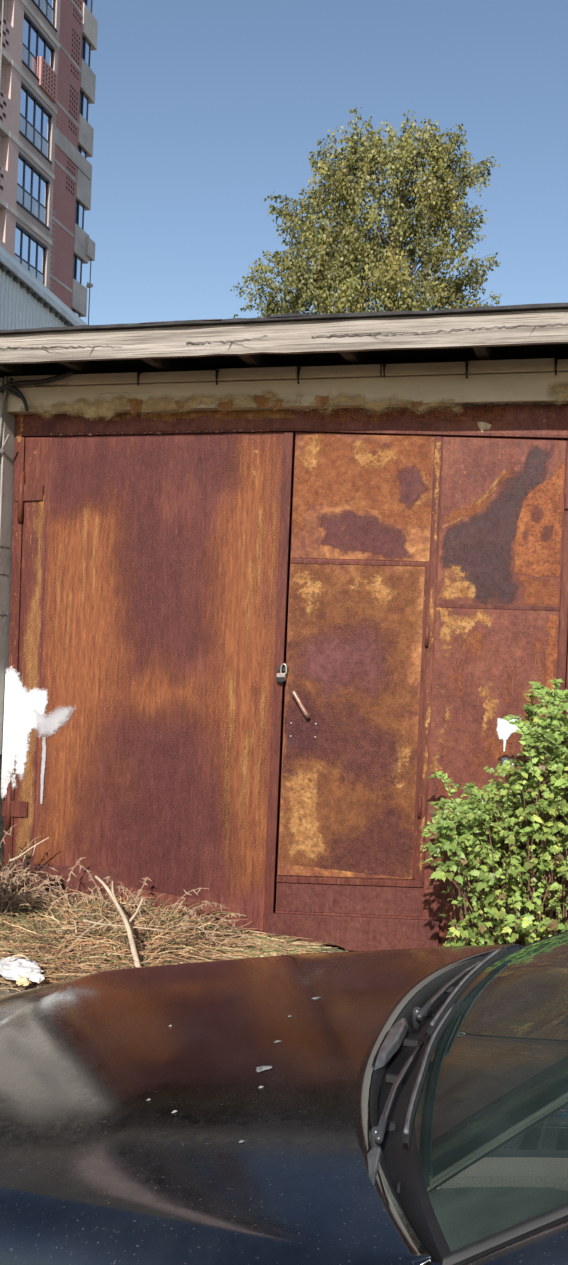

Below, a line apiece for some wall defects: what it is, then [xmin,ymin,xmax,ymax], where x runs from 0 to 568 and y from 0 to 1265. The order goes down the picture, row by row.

peeling [1,766,16,797]
corrosion [16,392,505,884]
corrosion [390,459,565,812]